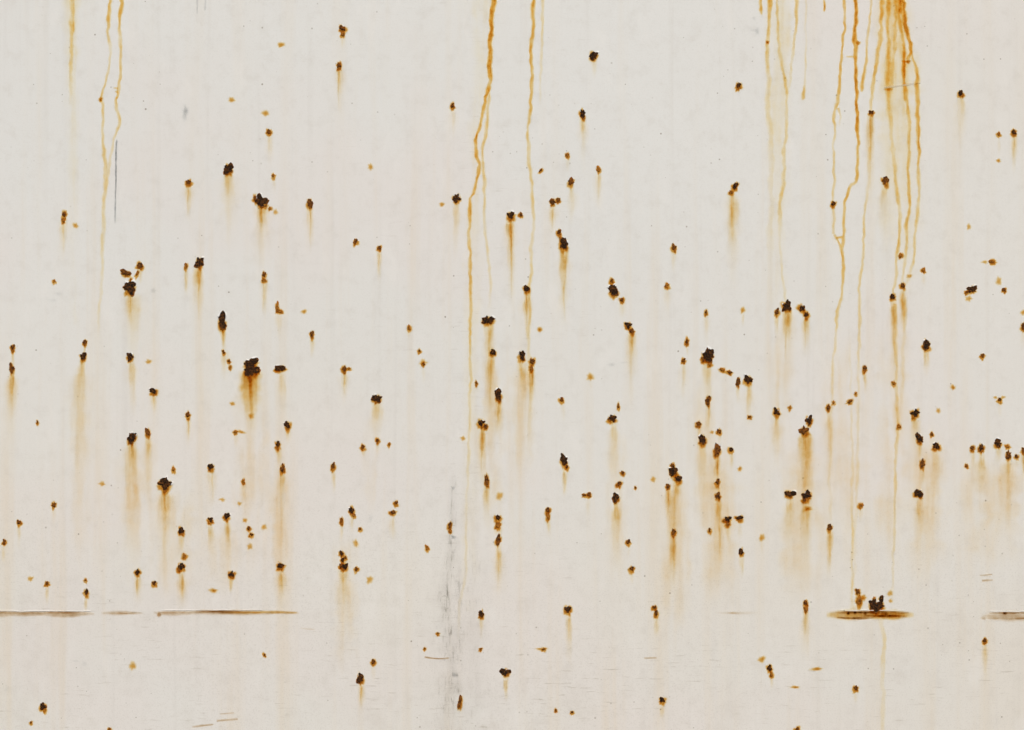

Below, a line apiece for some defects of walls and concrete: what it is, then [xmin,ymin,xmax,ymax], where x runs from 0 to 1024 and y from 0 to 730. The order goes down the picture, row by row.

corrosion [253,193,271,210]
corrosion [557,229,569,250]
corrosion [120,262,143,297]
corrosion [606,278,624,304]
corrosion [217,311,227,331]
corrosion [774,299,809,320]
corrosion [244,356,261,386]
corrosion [701,345,753,387]
corrosion [157,467,175,494]
corrosion [666,463,682,490]
corrosion [784,489,812,509]
corrosion [855,589,884,614]